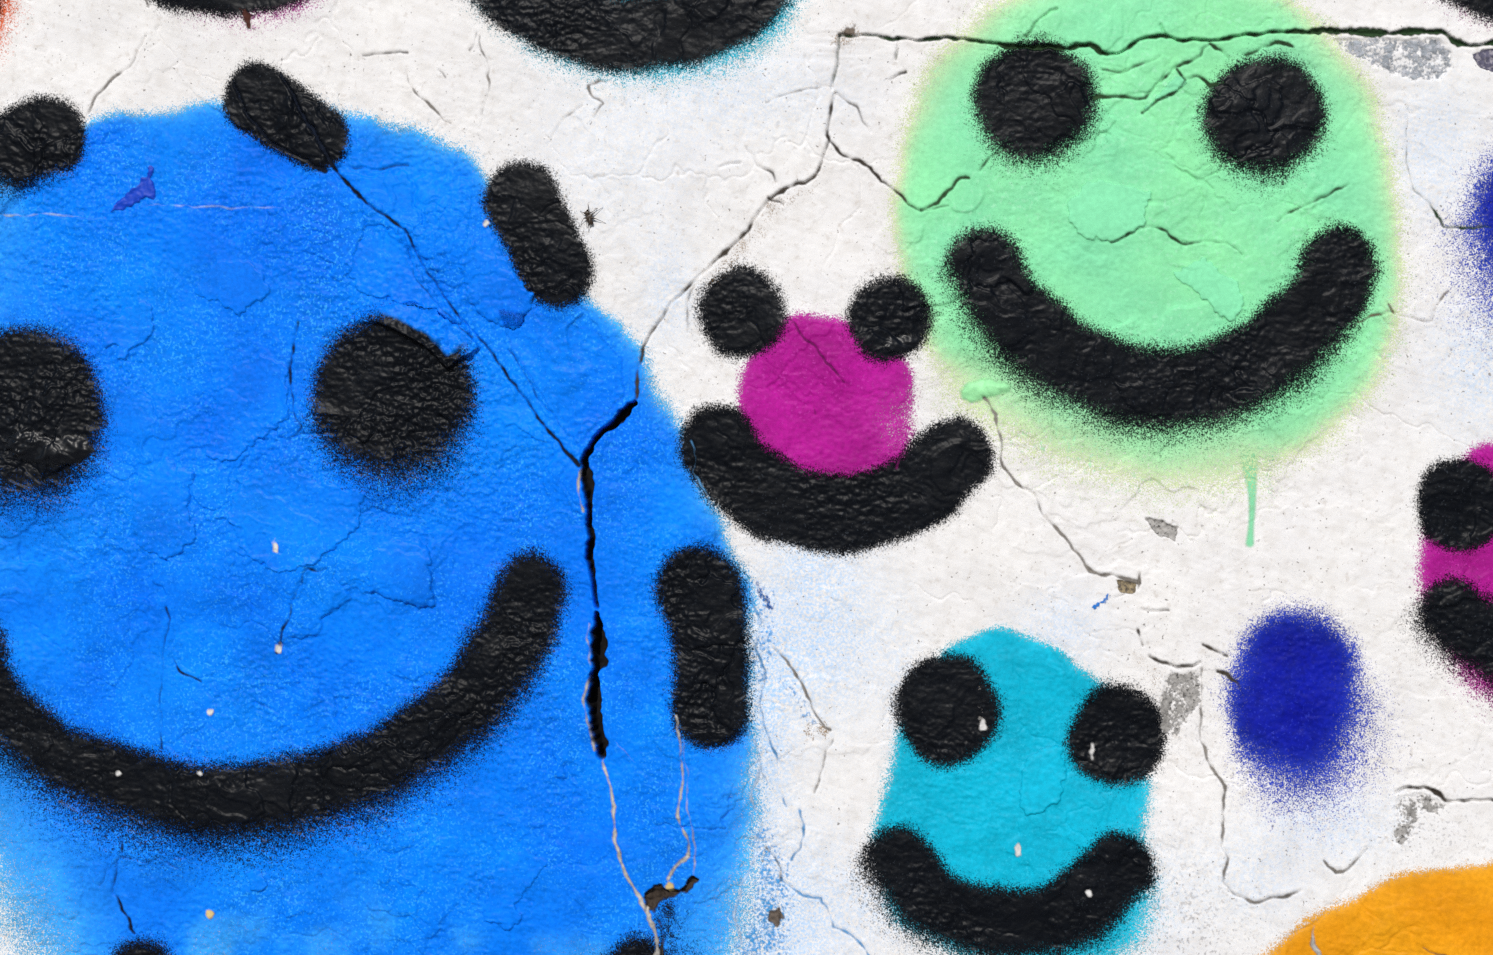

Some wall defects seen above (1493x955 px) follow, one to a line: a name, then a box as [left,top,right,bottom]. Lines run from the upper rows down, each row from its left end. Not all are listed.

flaking render [1339,37,1451,79]
crack [234,73,432,278]
crack [449,27,1493,955]
flaking render [1160,672,1201,735]